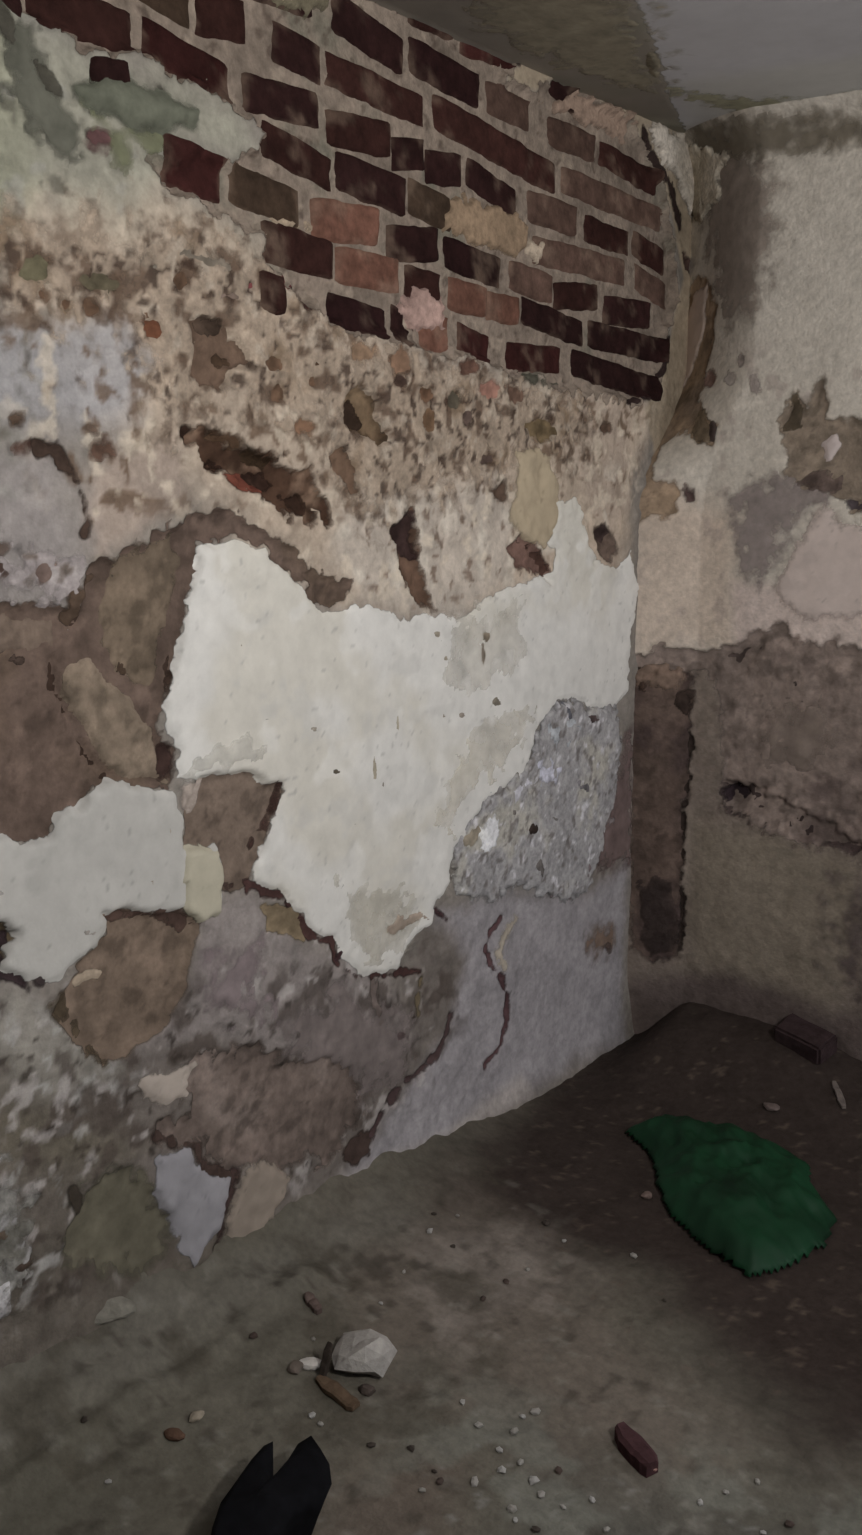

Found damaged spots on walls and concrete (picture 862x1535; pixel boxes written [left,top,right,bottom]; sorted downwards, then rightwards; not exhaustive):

flaking render [0,0,862,1066]
crack [242,878,453,1166]
crack [483,915,518,1070]